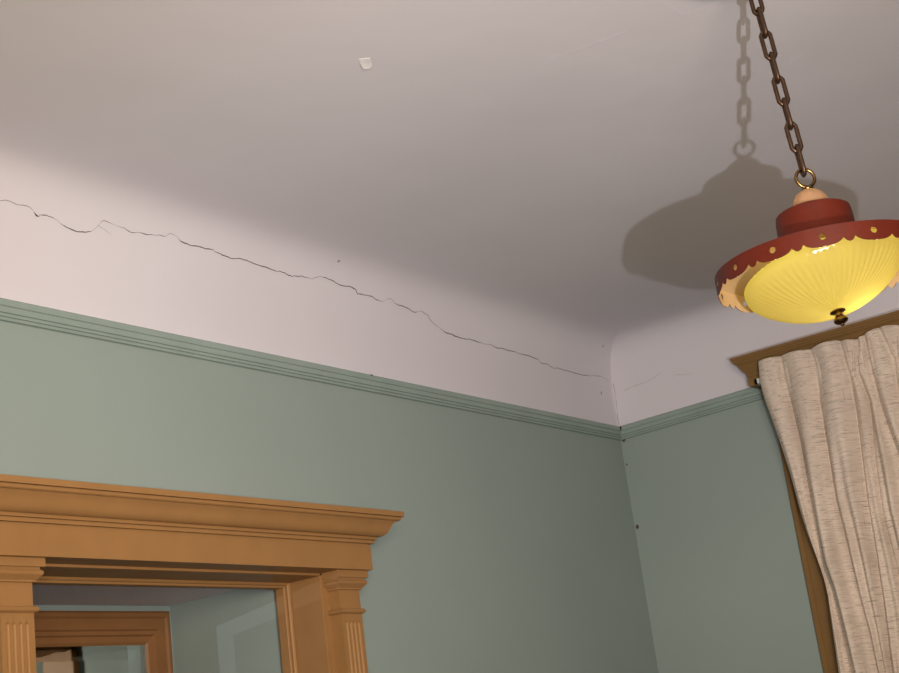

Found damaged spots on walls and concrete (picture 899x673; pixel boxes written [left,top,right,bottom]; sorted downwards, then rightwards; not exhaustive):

crack [1,200,653,424]